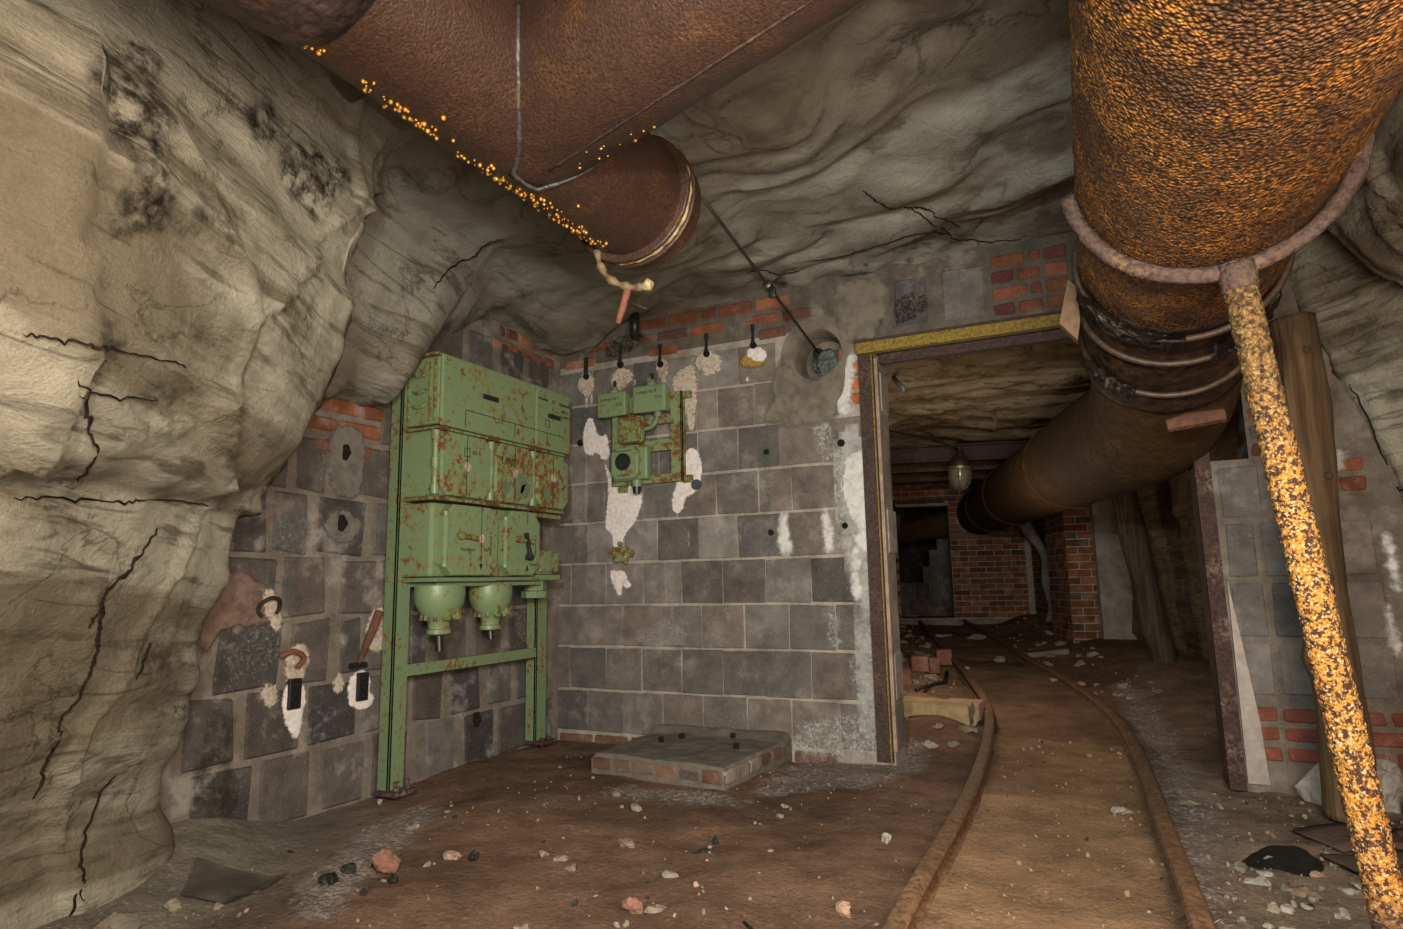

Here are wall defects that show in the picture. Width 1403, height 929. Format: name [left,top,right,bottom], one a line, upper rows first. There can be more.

crack [23,332,188,368]
crack [13,380,209,799]
peeling [365,607,384,653]
damp [663,423,920,796]
peeling [260,643,310,738]
peeling [332,670,374,710]
crack [69,775,116,917]